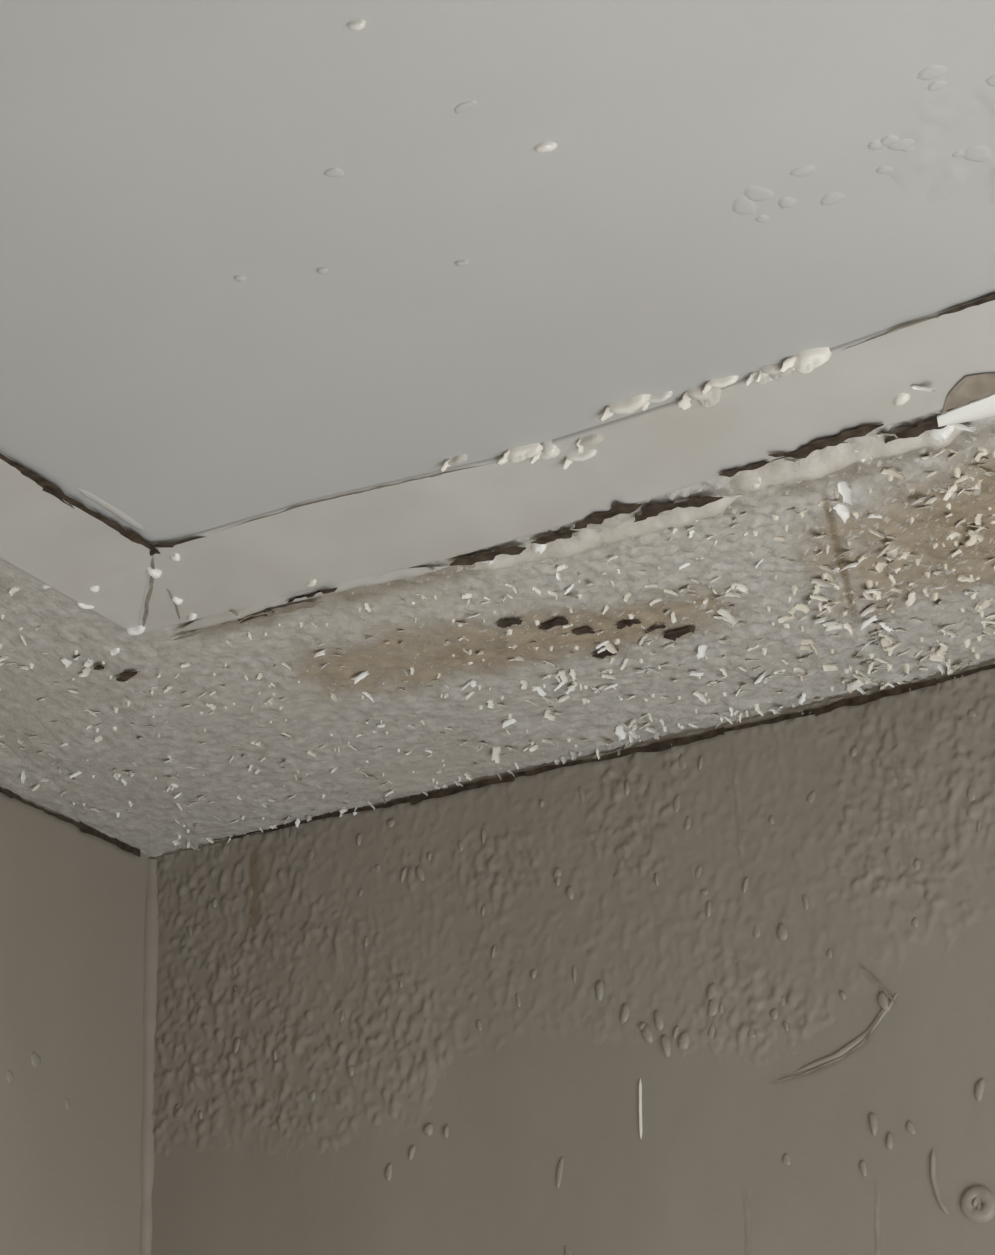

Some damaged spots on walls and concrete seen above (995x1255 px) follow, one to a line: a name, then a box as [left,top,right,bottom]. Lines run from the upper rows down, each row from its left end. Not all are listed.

peeling [496,347,831,470]
peeling [76,586,100,609]
peeling [125,624,145,635]
peeling [0,644,300,745]
peeling [146,567,162,579]
leakage [306,601,719,687]
peeling [154,373,995,850]
crack [450,419,947,566]
leakage [823,460,995,592]
peeling [0,735,132,818]